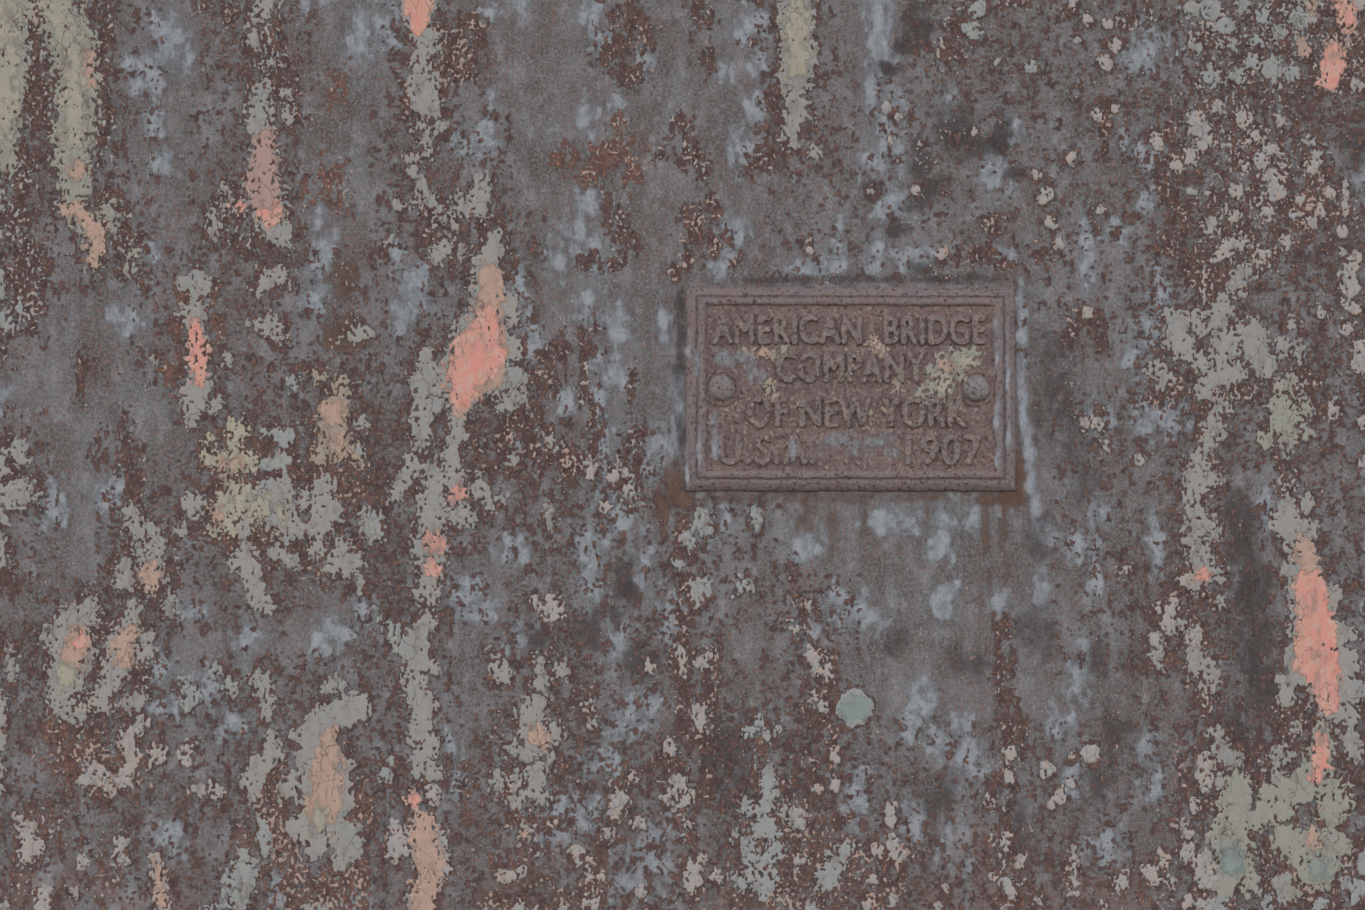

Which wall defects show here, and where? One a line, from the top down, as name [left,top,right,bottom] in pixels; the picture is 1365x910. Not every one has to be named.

corrosion [0,0,68,384]
corrosion [90,0,154,270]
peeling [114,0,162,34]
corrosion [181,0,360,232]
corrosion [540,0,744,347]
corrosion [1096,0,1365,320]
corrosion [179,406,374,605]
corrosion [473,304,659,506]
corrosion [229,749,384,910]
peeling [907,715,938,751]
peeling [945,734,961,760]
corrosion [958,357,1318,910]